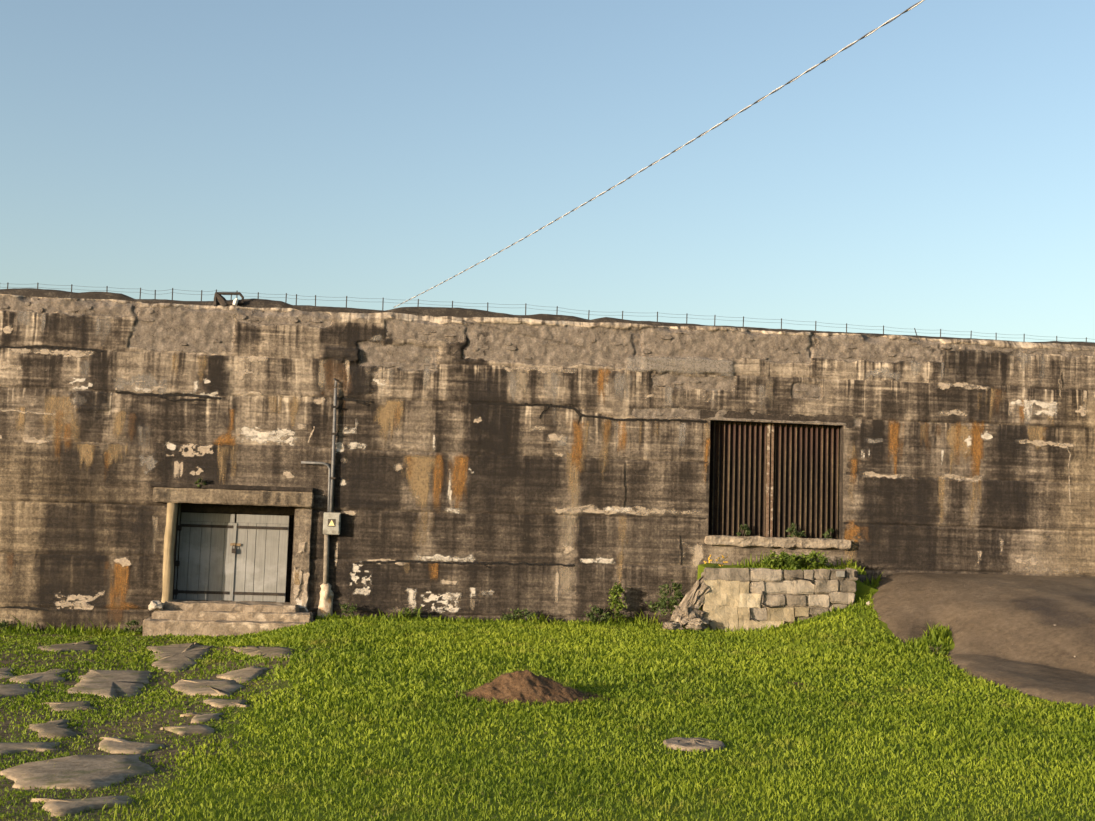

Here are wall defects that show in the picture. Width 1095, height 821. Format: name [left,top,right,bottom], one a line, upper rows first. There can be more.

leakage [2,311,109,413]
leakage [140,442,221,483]
leakage [241,424,315,446]
corrosion [889,423,898,473]
corrosion [921,389,1053,518]
leakage [964,399,1074,451]
corrosion [404,455,468,527]
corrosion [110,563,129,623]
leakage [350,559,403,595]
leakage [407,579,475,613]
leakage [420,554,474,562]
leakage [555,505,692,564]